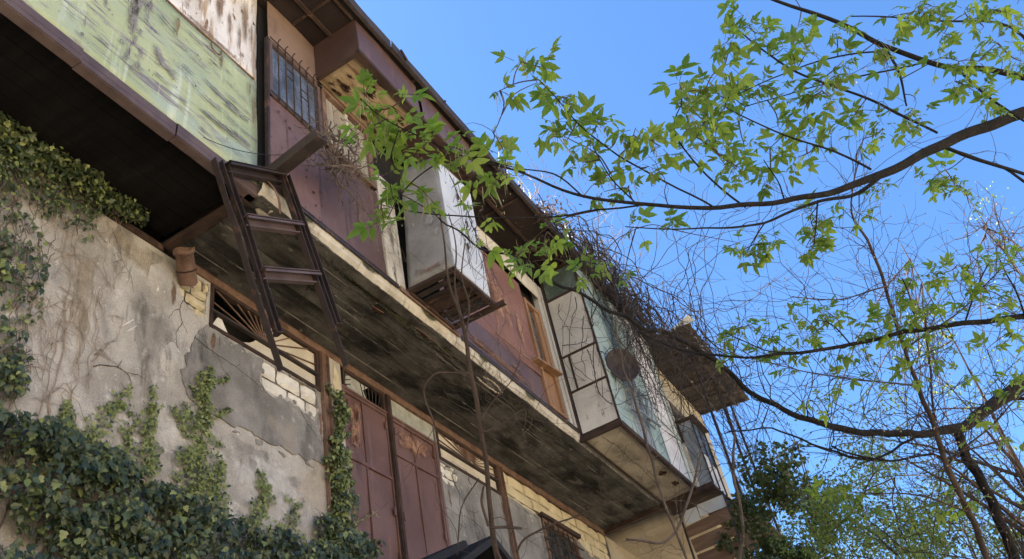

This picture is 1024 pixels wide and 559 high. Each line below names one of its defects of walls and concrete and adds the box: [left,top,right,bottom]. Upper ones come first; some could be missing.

damp [268,283,324,313]
crack [169,301,263,391]
peeling [174,269,324,468]